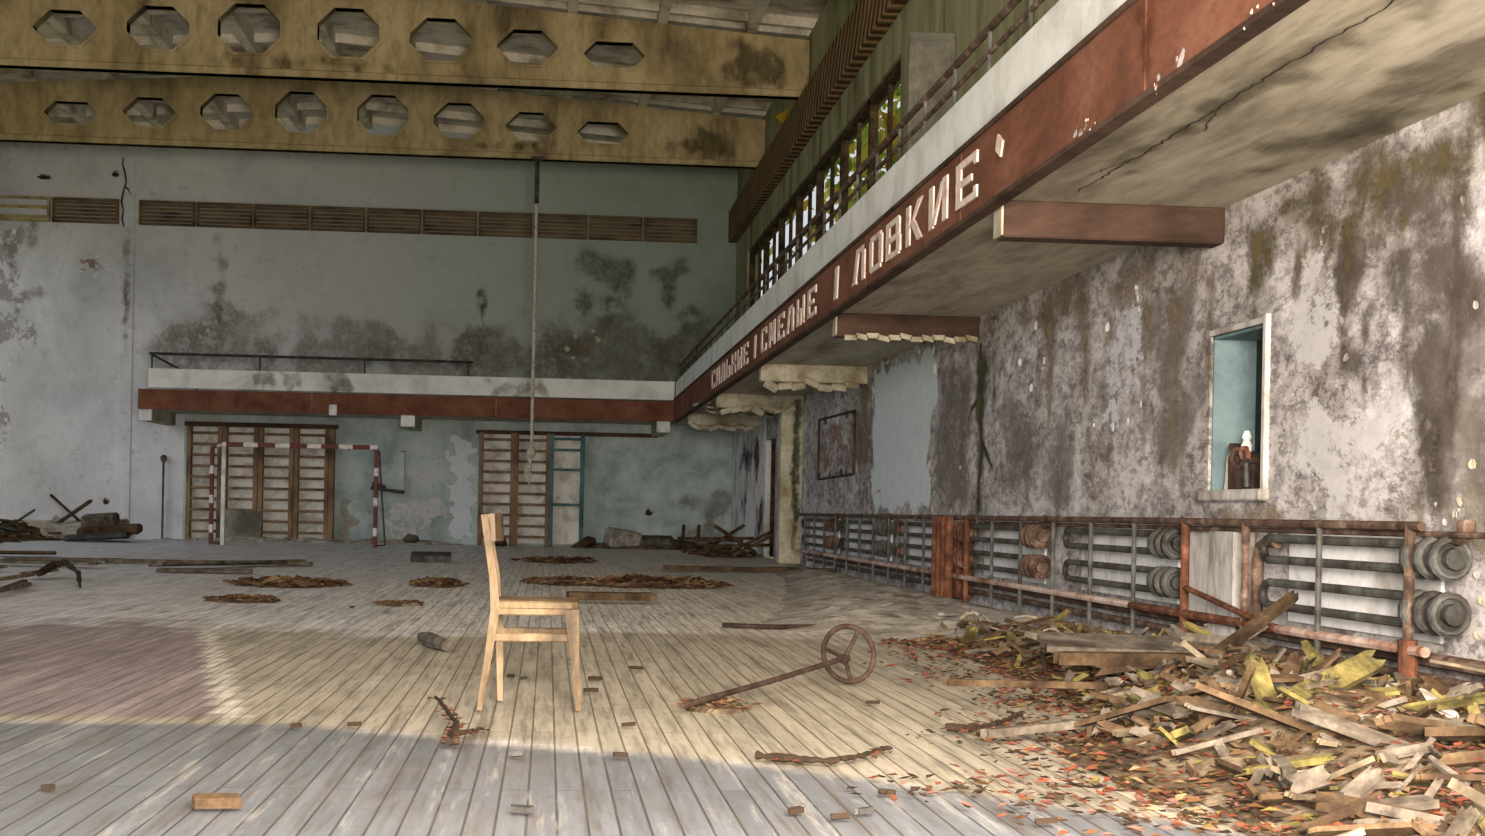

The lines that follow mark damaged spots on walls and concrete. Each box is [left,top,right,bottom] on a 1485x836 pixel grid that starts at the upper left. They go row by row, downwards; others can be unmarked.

leakage [723,40,784,87]
leakage [1328,38,1485,140]
peeling [0,227,37,382]
leakage [300,252,701,398]
leakage [936,273,1089,507]
leakage [1109,246,1214,487]
leakage [1251,267,1260,290]
leakage [1292,252,1301,295]
leakage [1336,222,1371,388]
leakage [1386,184,1485,531]
peeling [334,432,478,544]